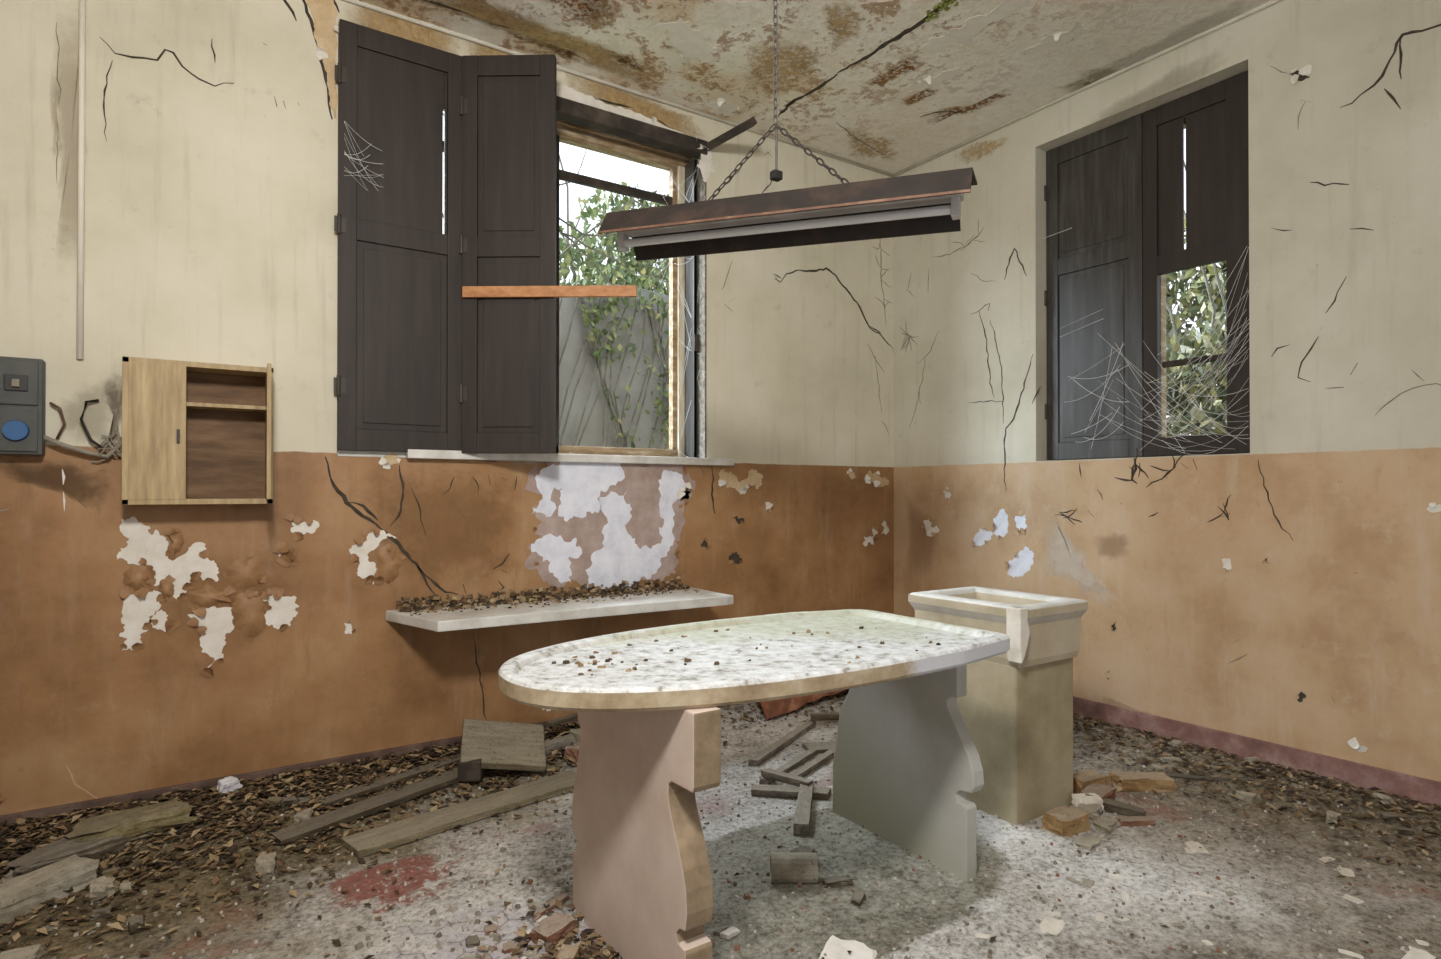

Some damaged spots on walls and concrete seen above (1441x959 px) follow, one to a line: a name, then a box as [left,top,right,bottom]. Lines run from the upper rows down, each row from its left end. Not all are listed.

crack [100,37,234,141]
peeling [557,84,715,182]
crack [1271,24,1441,125]
crack [774,220,1041,487]
crack [1271,276,1358,388]
peeling [117,517,234,678]
peeling [260,587,299,632]
peeling [349,528,396,585]
crack [325,457,517,595]
peeling [525,453,696,590]
peeling [971,509,1034,578]
crack [1208,461,1294,541]